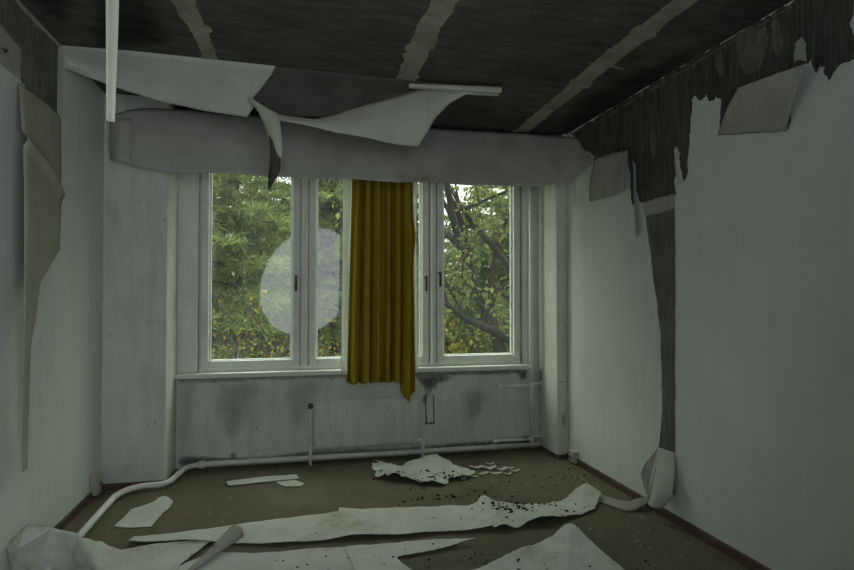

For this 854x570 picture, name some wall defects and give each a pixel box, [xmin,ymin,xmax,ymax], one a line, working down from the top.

flaking render [570,0,854,453]